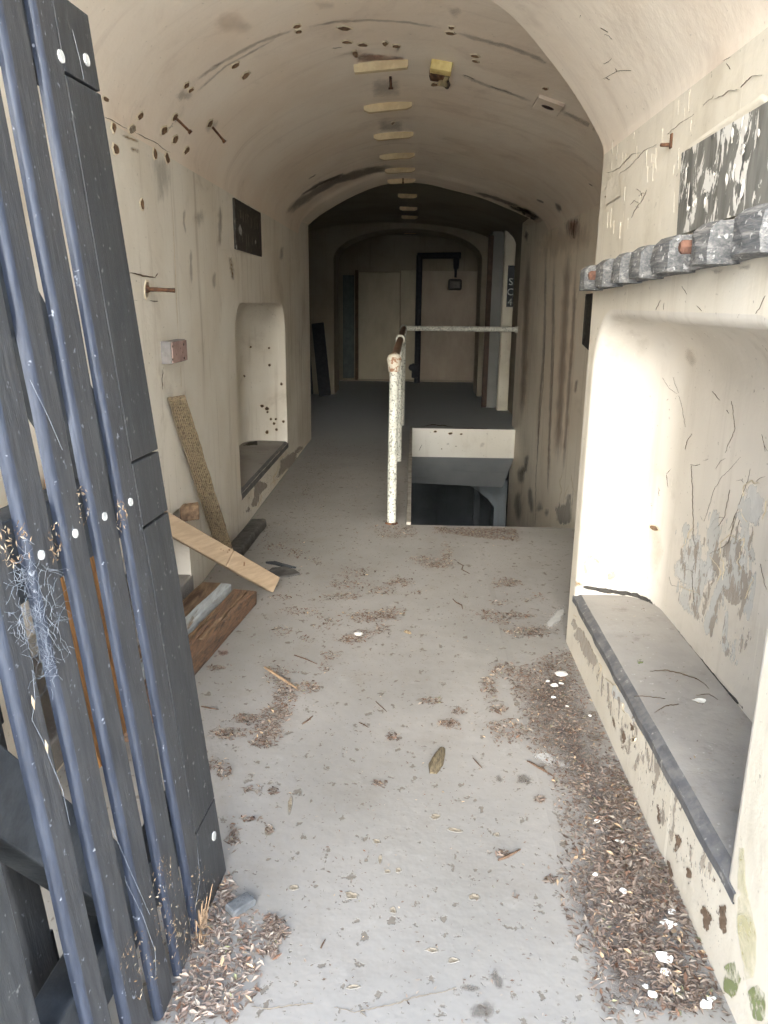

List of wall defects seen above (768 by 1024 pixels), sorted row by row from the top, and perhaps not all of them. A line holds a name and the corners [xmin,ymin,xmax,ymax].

crack [614,57,758,218]
water stain [555,495,573,525]
crack [658,378,762,602]
peeling [674,496,756,665]
peeling [700,995,716,1009]